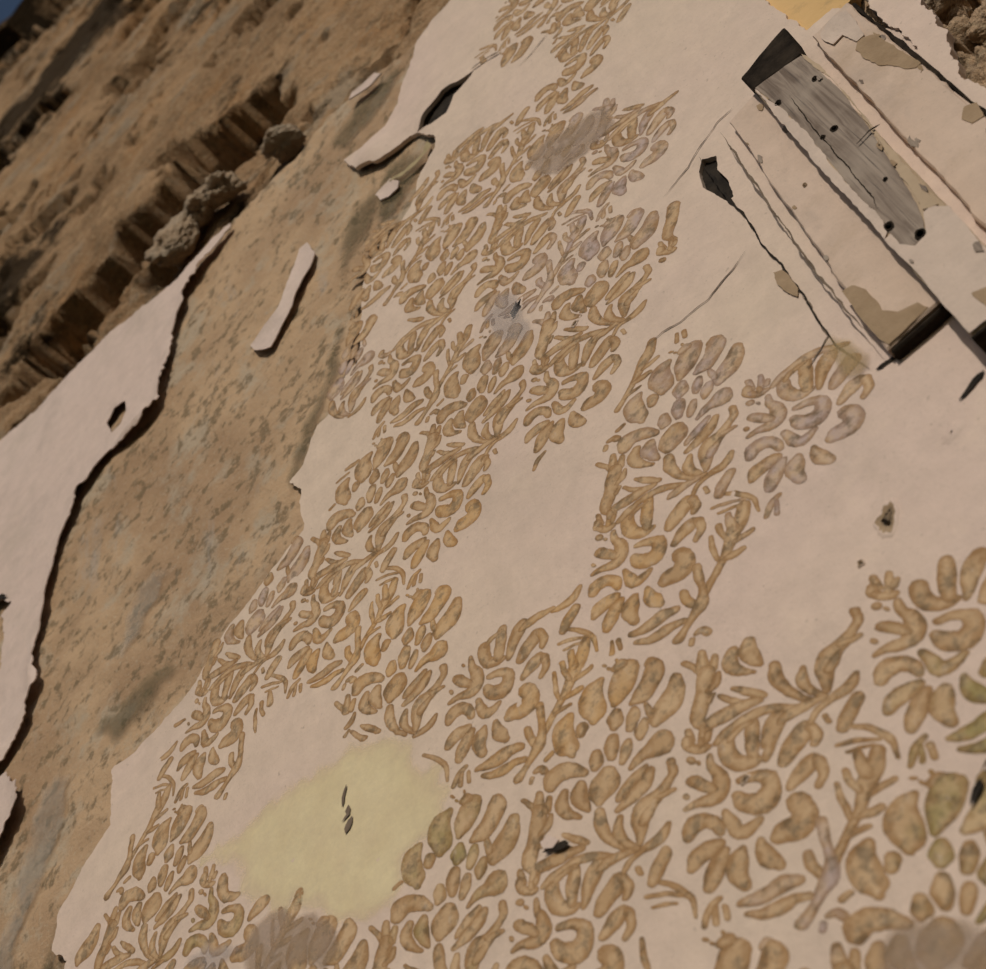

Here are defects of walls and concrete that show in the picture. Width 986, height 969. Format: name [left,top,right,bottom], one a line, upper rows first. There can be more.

peeling [855,32,923,72]
flaking render [349,73,382,100]
peeling [962,102,984,124]
flaking render [375,179,400,201]
crack [646,112,840,367]
flaking render [250,243,315,351]
peeling [842,285,929,345]
peeling [972,287,986,305]
crack [863,356,896,370]
flaking render [0,223,231,836]
spalling [342,786,352,833]
water stain [218,743,440,969]